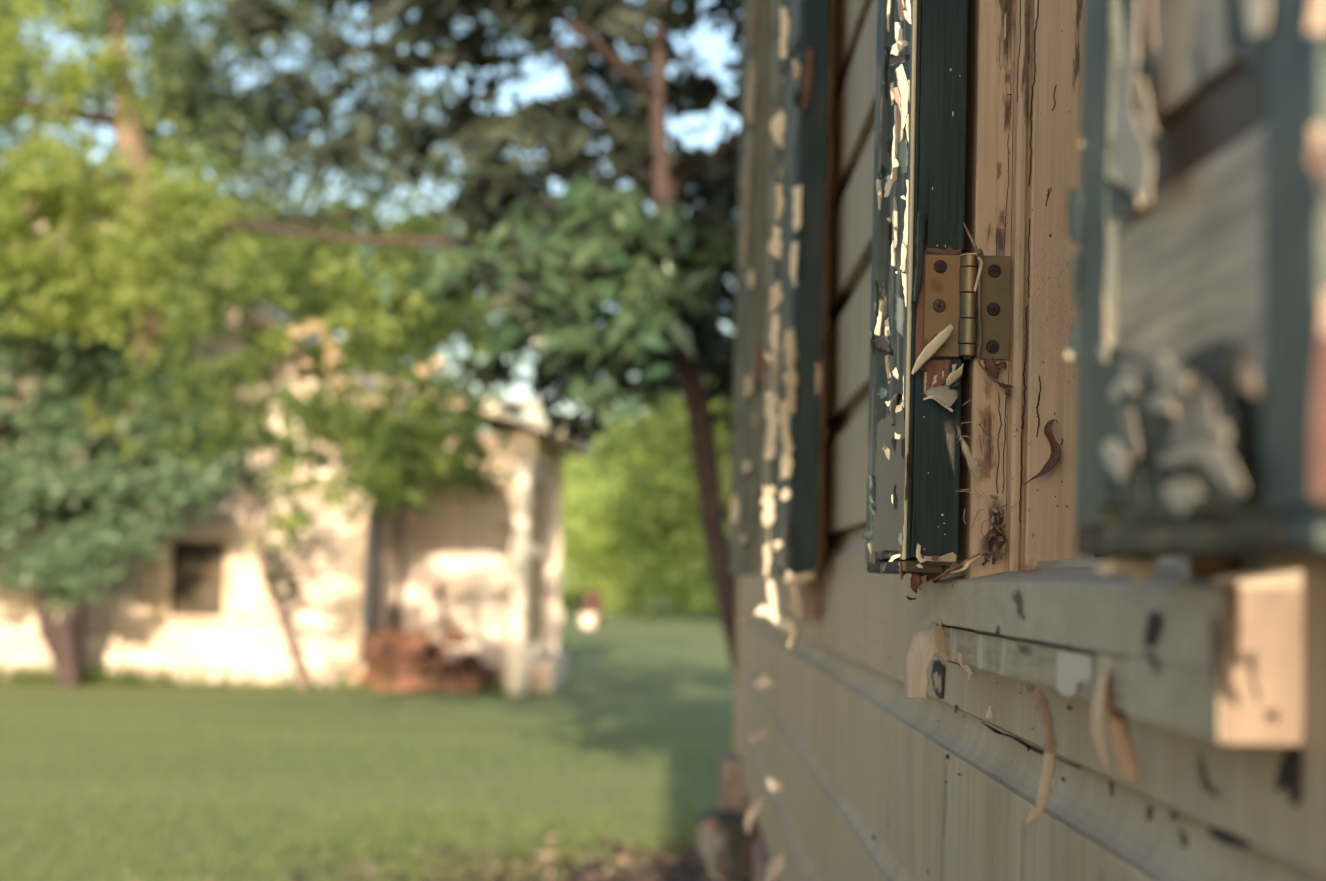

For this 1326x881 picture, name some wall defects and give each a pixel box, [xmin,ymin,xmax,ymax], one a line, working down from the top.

peeling [770,6,813,149]
peeling [999,0,1030,124]
peeling [1105,0,1158,224]
peeling [1225,0,1269,70]
peeling [1307,0,1326,33]
peeling [863,0,961,574]
peeling [742,184,815,650]
peeling [1096,336,1258,516]
peeling [1311,292,1326,502]
peeling [931,650,976,718]
spalling [982,722,1082,782]
peeling [1057,650,1092,710]